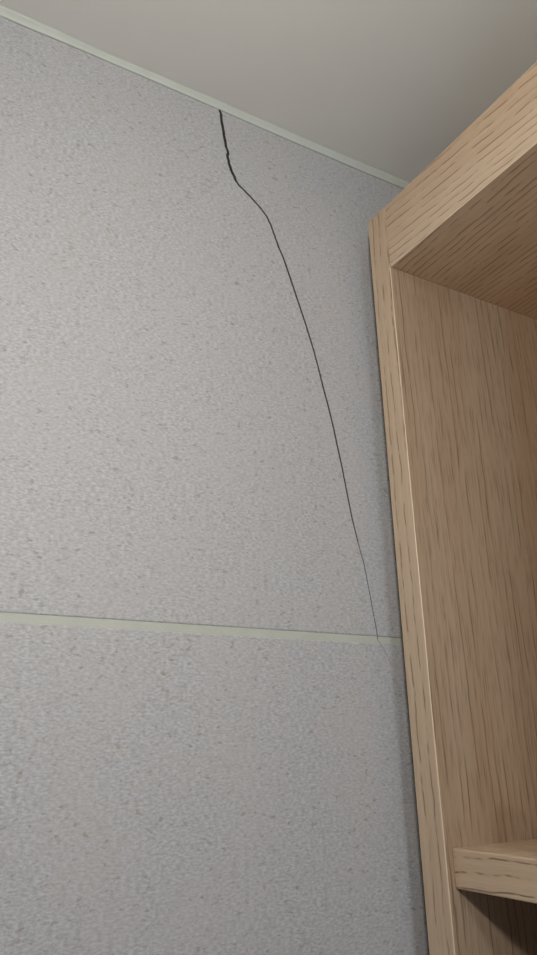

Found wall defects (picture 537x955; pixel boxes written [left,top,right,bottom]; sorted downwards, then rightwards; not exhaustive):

crack [218,109,392,666]